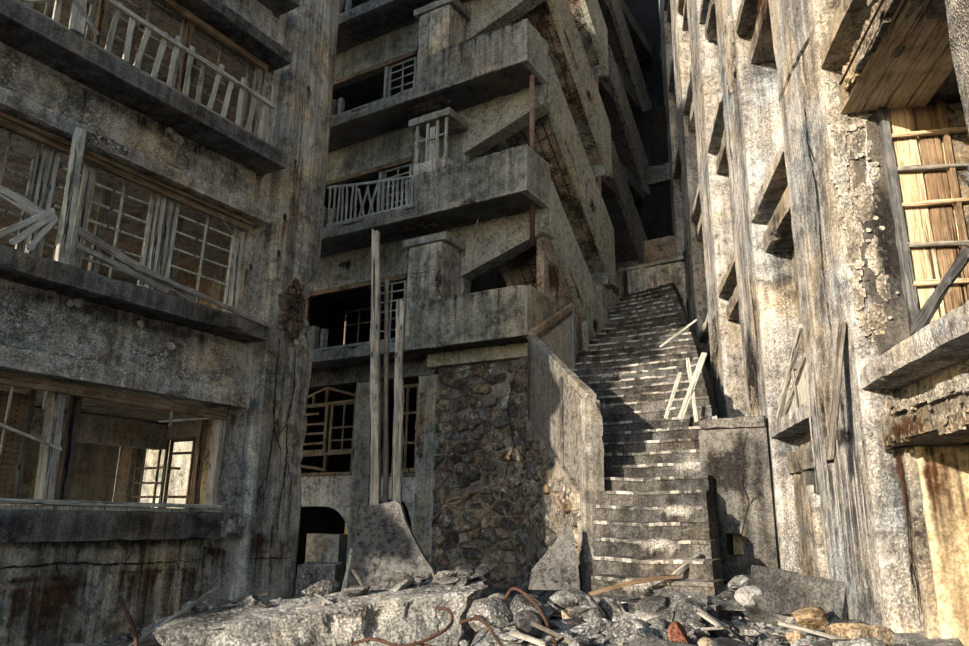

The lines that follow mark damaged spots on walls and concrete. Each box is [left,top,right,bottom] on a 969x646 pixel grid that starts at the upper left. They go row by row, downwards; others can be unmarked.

flaking render [824,0,910,357]
rust [8,576,86,642]
rust [118,547,226,602]
crack [248,339,296,576]